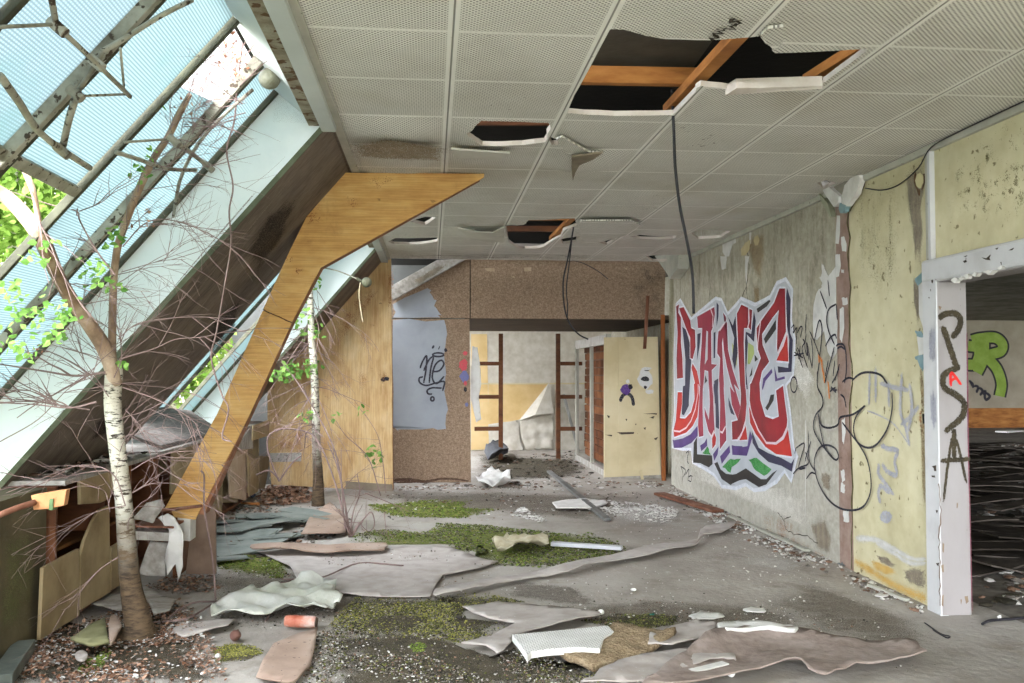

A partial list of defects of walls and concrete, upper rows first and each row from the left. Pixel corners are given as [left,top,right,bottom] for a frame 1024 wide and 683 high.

water stain [348,137,445,162]
peeling [813,175,865,359]
water stain [856,160,925,320]